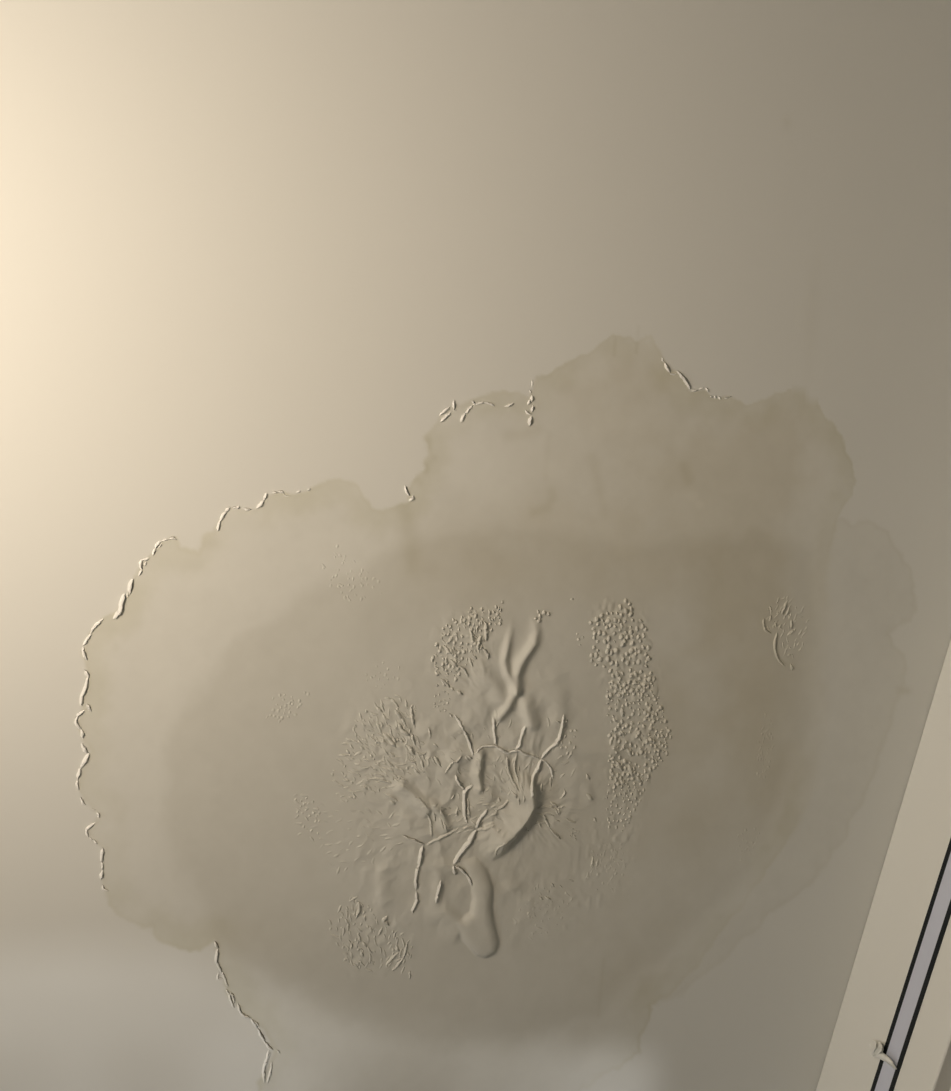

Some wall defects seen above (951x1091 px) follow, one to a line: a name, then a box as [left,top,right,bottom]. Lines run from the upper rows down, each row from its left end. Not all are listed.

peeling [440,400,513,422]
peeling [74,536,177,891]
crack [402,714,565,914]
leakage [73,199,922,1091]